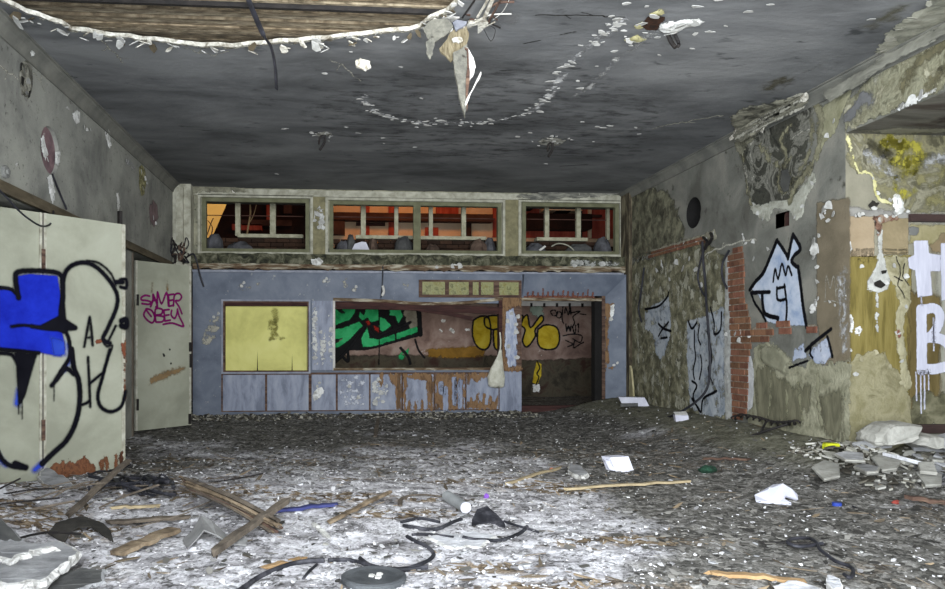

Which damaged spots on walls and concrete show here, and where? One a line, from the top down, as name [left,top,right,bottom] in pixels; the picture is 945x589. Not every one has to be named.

spalling [0,0,464,55]
spalling [356,5,728,128]
peeling [729,92,809,156]
peeling [816,0,945,161]
leakage [843,40,945,245]
peeling [571,259,618,267]
flaking render [632,136,912,442]
corrosion [39,451,124,477]